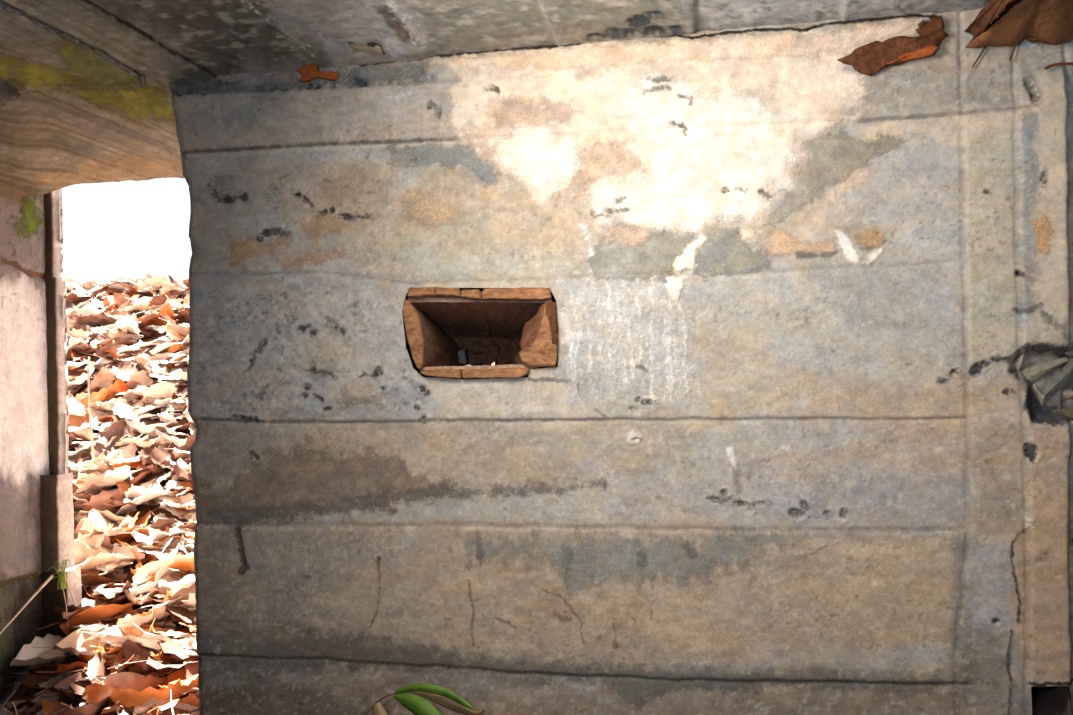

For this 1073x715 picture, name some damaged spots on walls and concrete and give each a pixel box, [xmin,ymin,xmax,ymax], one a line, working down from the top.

water stain [388,13,935,403]
crack [995,343,1029,362]
spalling [969,342,1073,427]
crack [1012,303,1067,339]
water stain [190,445,606,528]
water stain [465,528,782,592]
crack [1004,529,1026,715]